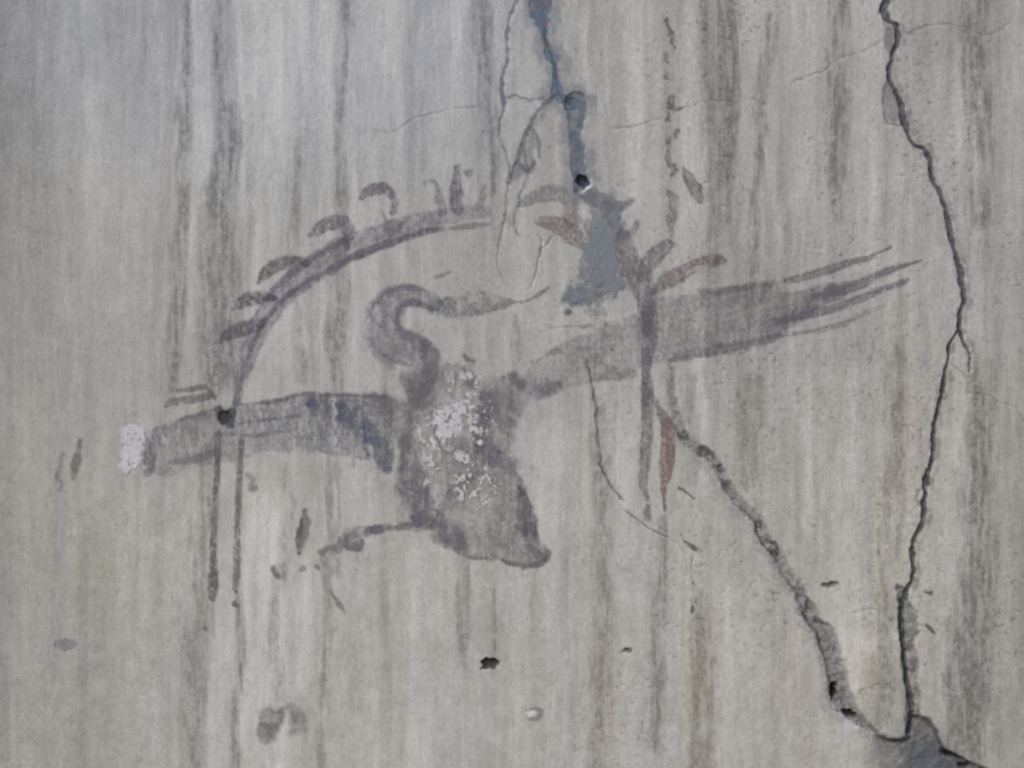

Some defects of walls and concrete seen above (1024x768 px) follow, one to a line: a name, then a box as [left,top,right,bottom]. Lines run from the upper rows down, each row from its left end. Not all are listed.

crack [514,128,533,171]
crack [531,0,586,194]
crack [879,0,967,735]
spalling [119,424,146,474]
flaking render [415,371,499,514]
crack [669,368,872,731]
spalling [879,716,984,768]